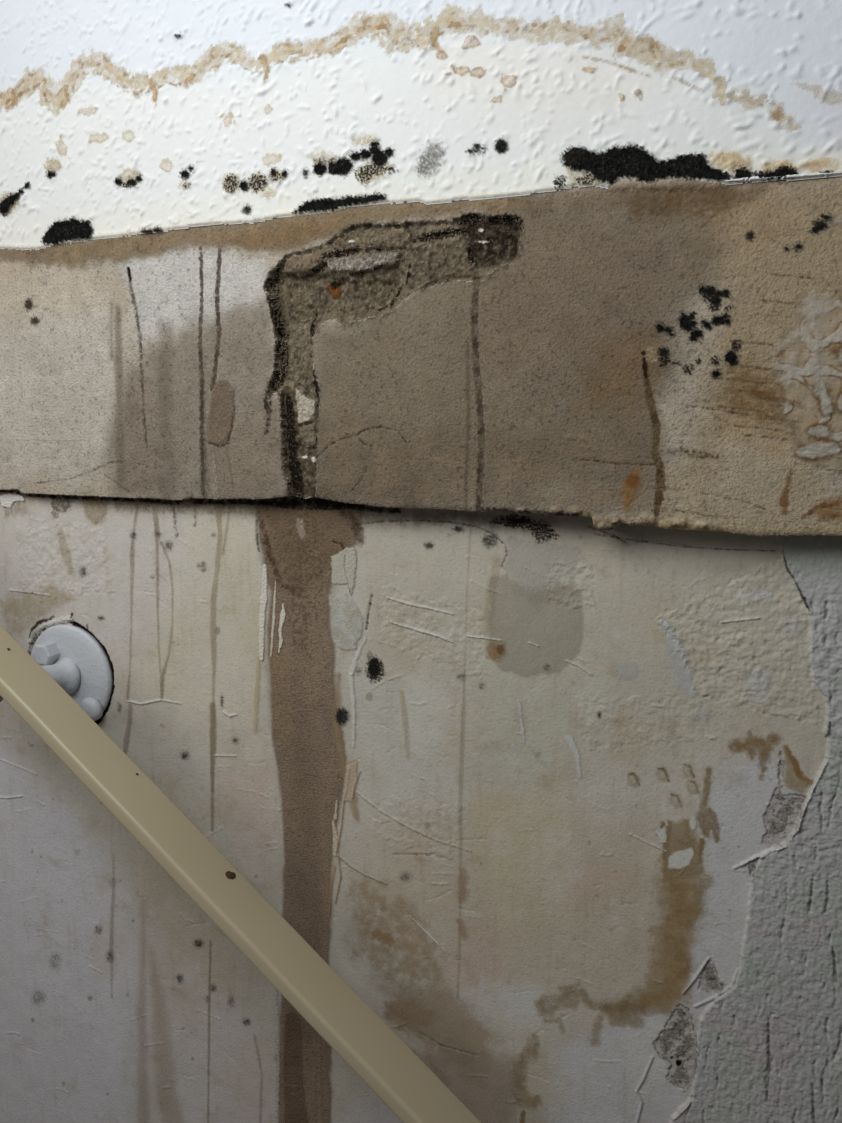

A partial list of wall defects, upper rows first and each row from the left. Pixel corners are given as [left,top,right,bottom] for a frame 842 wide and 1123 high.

leakage [0,6,763,113]
peeling [0,493,24,508]
crack [0,426,505,561]
leakage [0,135,839,964]
peeling [253,564,286,731]
peeling [329,547,366,913]
peeling [761,752,806,847]
leakage [538,765,719,1045]
leakage [274,988,331,1123]
leakage [354,889,540,1123]
peeling [652,1004,698,1090]
peeling [699,960,722,993]